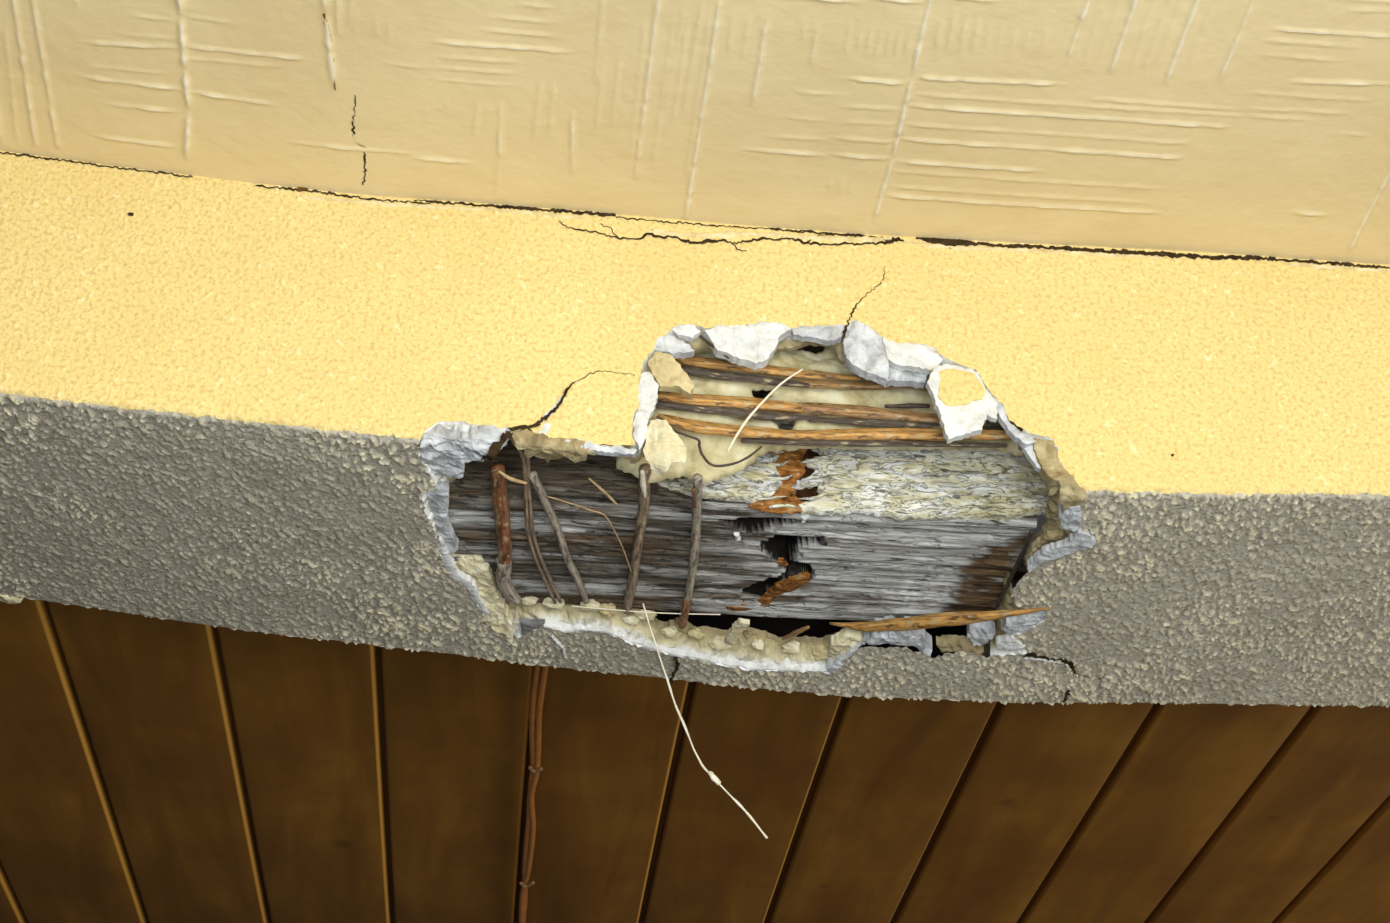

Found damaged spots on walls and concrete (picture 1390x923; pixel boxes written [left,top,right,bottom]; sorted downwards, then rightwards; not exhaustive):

crack [0,152,193,177]
crack [255,83,1390,339]
crack [480,371,635,462]
spalling [418,320,1096,675]
corrosion [748,449,819,515]
corrosion [725,557,811,611]